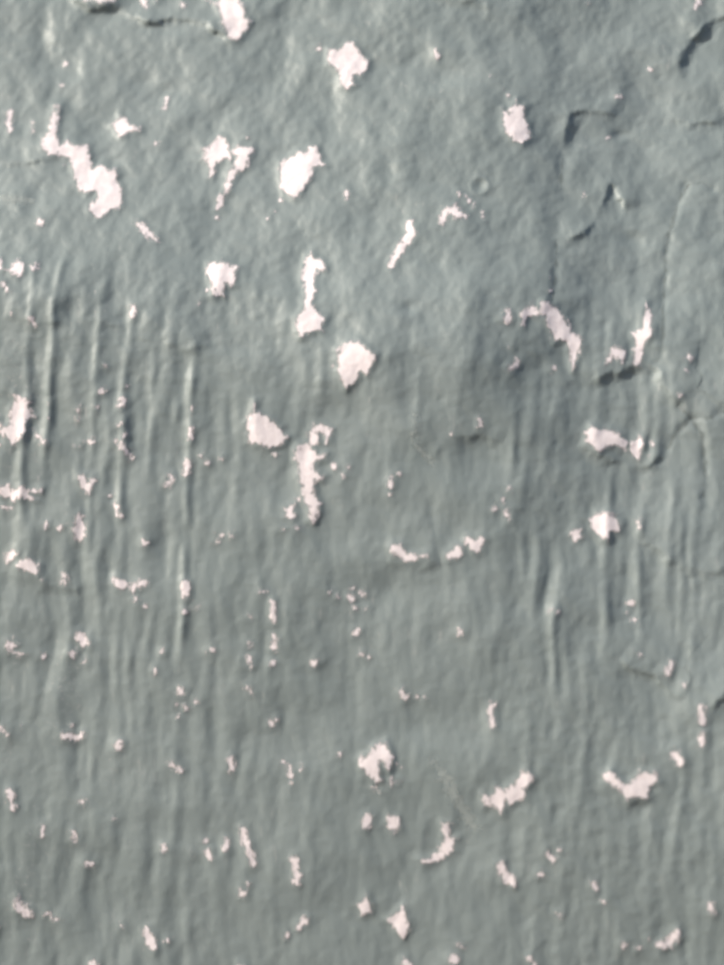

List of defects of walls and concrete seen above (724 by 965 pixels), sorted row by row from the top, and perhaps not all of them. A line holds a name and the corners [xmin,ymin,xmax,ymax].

peeling [213,0,252,41]
peeling [317,42,368,89]
peeling [503,94,530,143]
peeling [31,104,122,218]
peeling [266,146,324,220]
peeling [504,289,581,371]
peeling [332,341,376,389]
peeling [0,394,50,445]
peeling [246,403,288,457]
peeling [584,427,654,460]
peeling [283,423,350,531]
peeling [603,769,658,801]